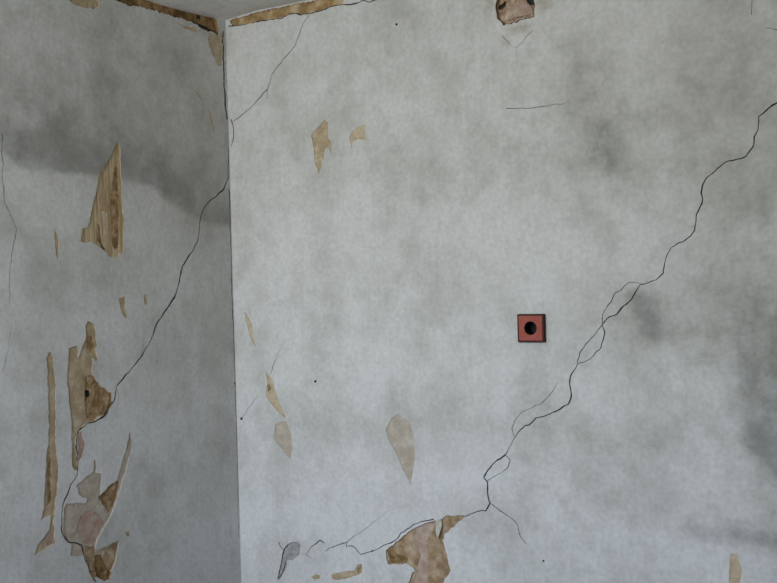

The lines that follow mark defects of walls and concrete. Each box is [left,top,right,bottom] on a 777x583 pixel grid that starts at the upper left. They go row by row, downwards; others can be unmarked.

flaking render [117,0,223,66]
flaking render [230,0,344,26]
peeling [311,119,332,173]
peeling [81,141,124,257]
crack [61,0,375,583]
crack [464,102,777,543]
peeling [35,352,132,581]
peeling [67,322,113,470]
peeling [266,372,293,459]
peeling [386,414,415,485]
crack [306,512,434,558]
flaking render [386,515,464,583]